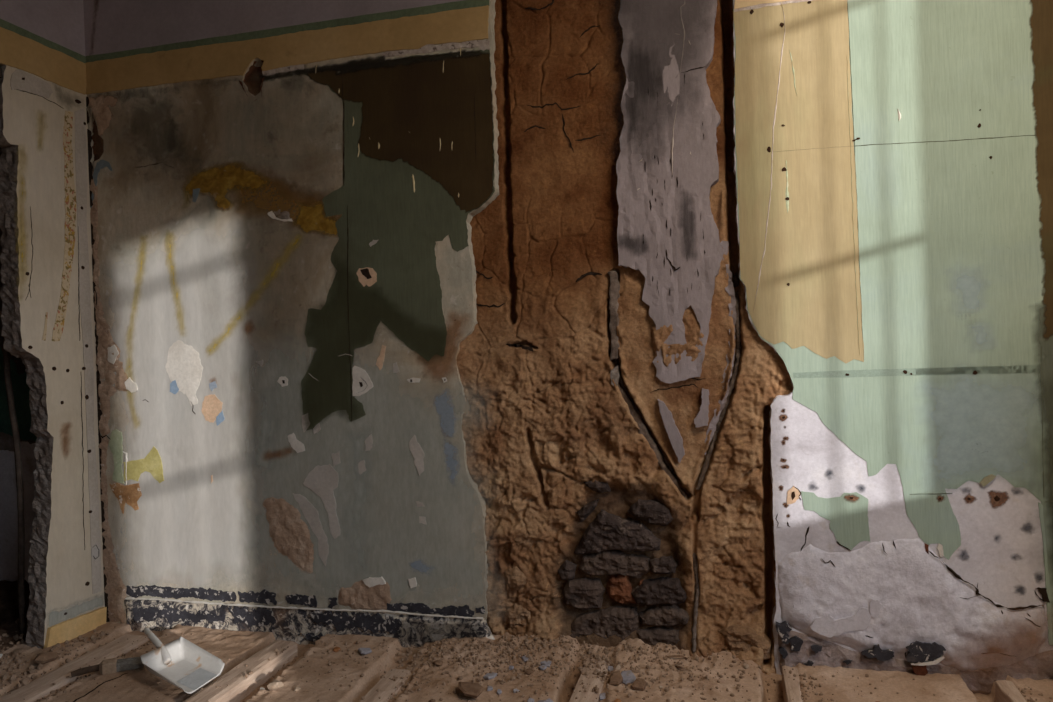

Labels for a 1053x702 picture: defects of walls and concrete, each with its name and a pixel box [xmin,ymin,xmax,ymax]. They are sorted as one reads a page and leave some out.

flaking render [239,39,490,100]
flaking render [89,119,485,642]
flaking render [608,271,686,497]
flaking render [705,241,737,455]
flaking render [787,486,801,505]
crack [928,550,1042,617]
peeling [909,654,945,676]